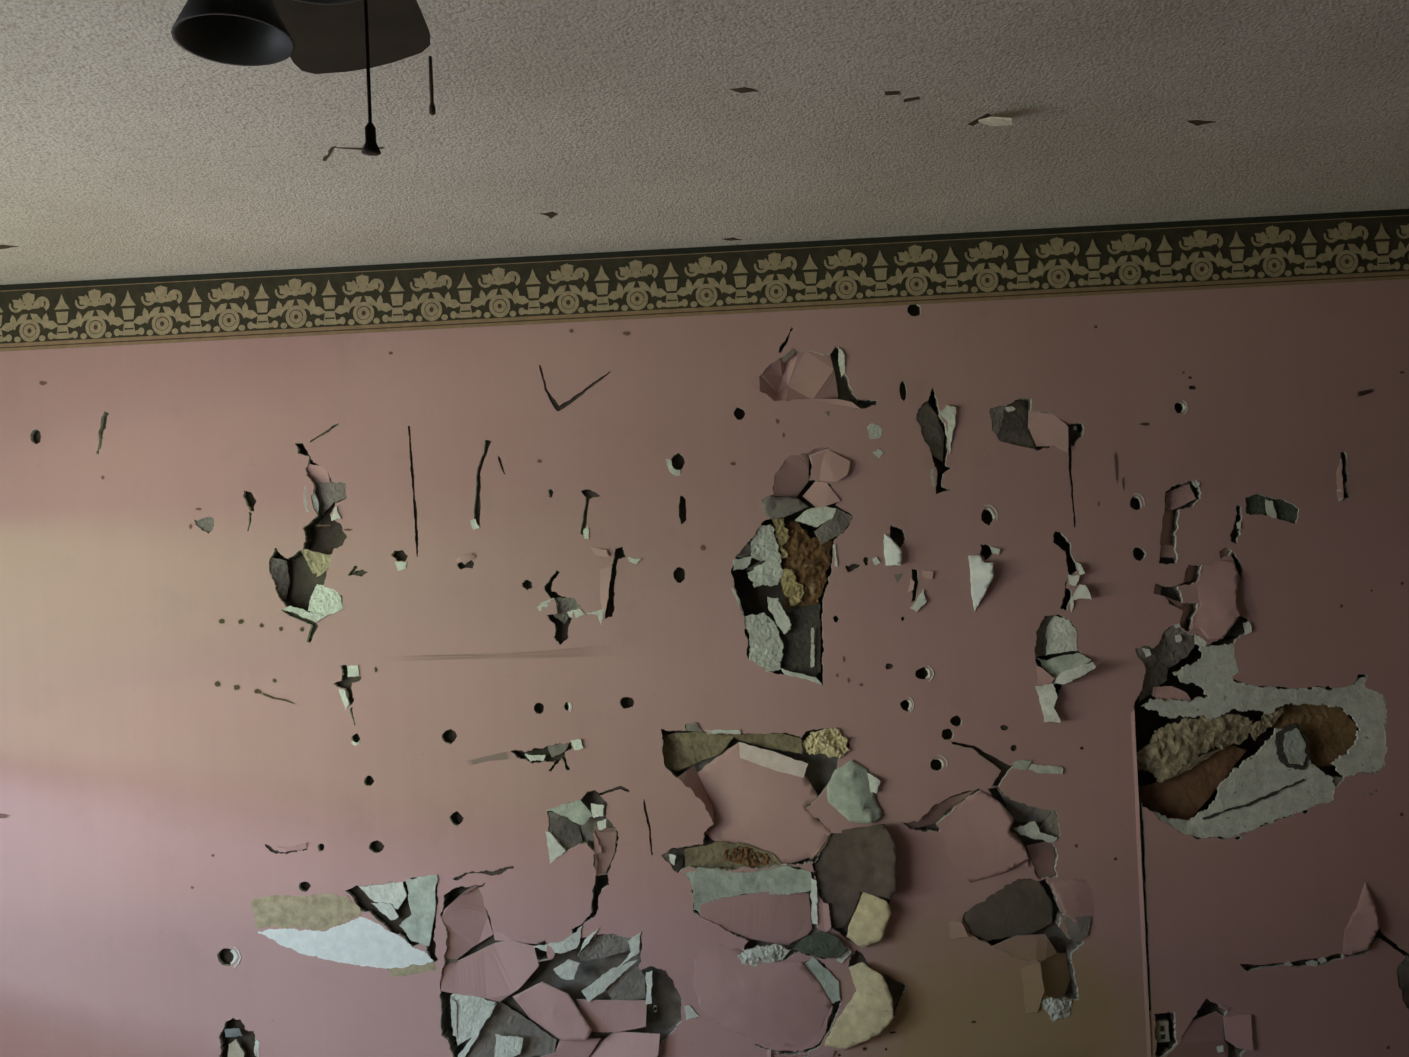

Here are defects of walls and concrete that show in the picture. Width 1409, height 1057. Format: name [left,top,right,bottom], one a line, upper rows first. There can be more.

spalling [269,443,347,623]
crack [539,365,610,411]
spalling [731,446,853,685]
spalling [899,381,956,494]
spalling [989,398,1084,452]
spalling [1035,531,1096,723]
spalling [1133,480,1387,840]
spalling [217,947,241,968]
spalling [251,803,700,1057]
spalling [661,722,852,1003]
spalling [904,787,1095,1022]
crack [1238,883,1409,972]